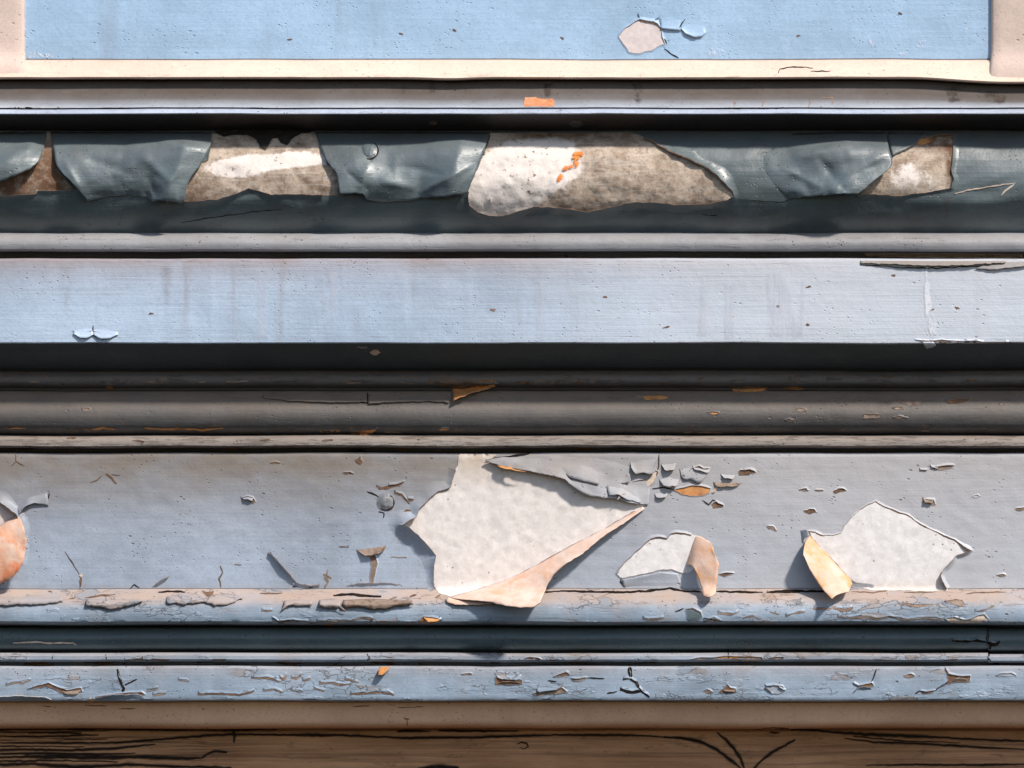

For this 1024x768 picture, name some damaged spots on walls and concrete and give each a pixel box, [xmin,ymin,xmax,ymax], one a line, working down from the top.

peeling [617,14,706,58]
peeling [0,120,740,226]
peeling [763,131,959,201]
peeling [860,253,1024,277]
peeling [0,490,63,606]
peeling [388,452,757,608]
peeling [615,530,735,623]
peeling [800,499,990,625]
peeling [0,681,147,700]
peeling [494,660,605,698]
peeling [851,669,877,693]
peeling [915,667,971,695]